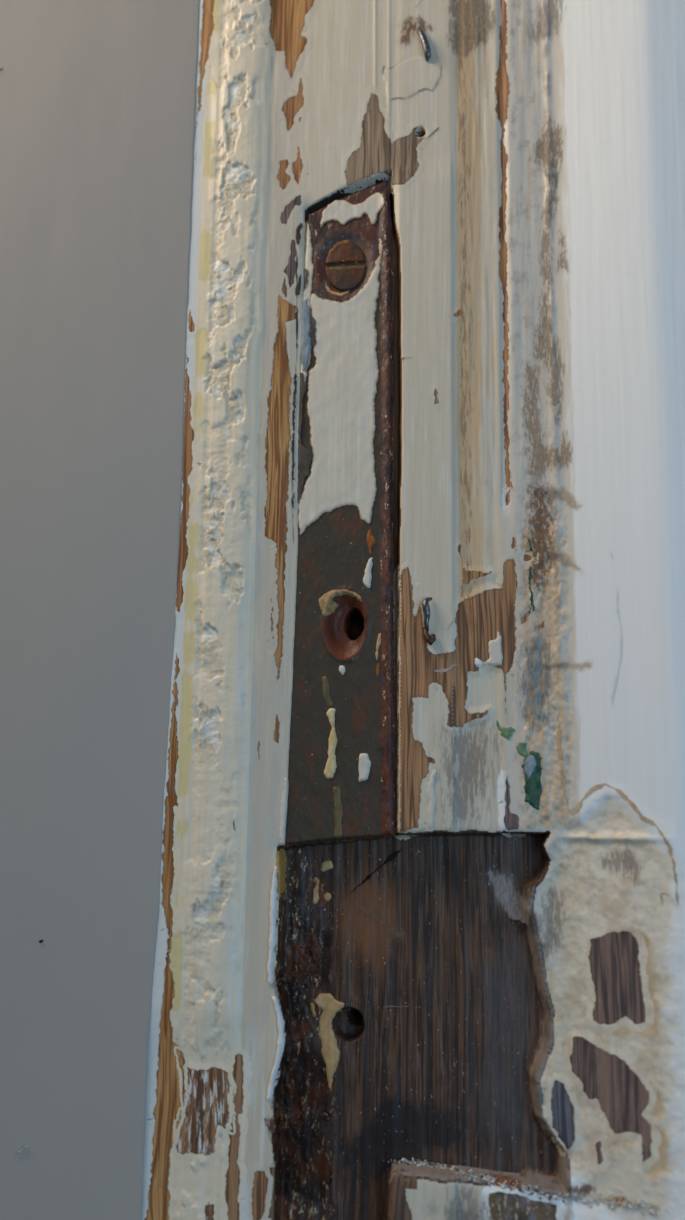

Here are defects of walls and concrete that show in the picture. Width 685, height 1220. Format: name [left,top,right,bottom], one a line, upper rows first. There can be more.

peeling [194,0,221,166]
peeling [338,56,441,194]
peeling [175,304,202,620]
peeling [256,0,321,689]
peeling [495,0,517,512]
peeling [250,708,287,767]
peeling [393,529,539,840]
peeling [142,646,273,1220]
peeling [542,923,662,1174]
peeling [389,1169,412,1220]
peeling [481,1183,566,1220]